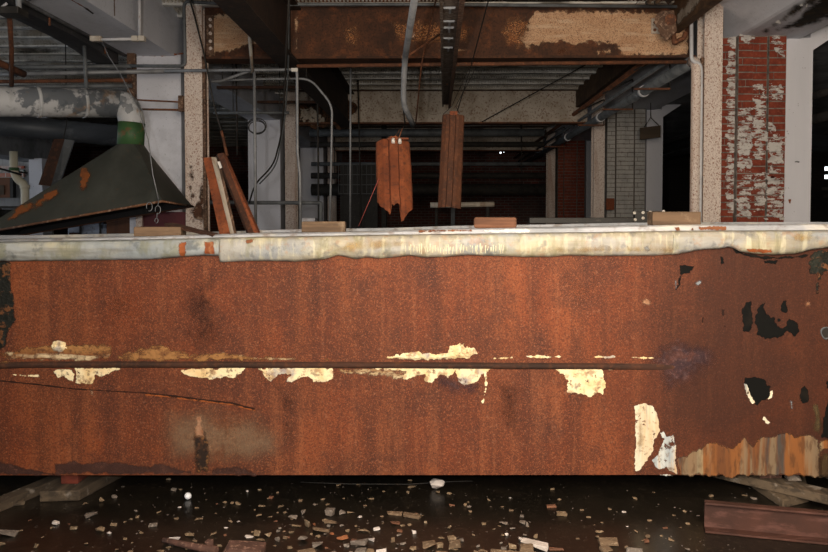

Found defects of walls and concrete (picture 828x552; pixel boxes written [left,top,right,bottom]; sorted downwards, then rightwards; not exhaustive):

peeling [520,0,699,55]
peeling [725,34,786,220]
rust [8,139,64,220]
rust [80,168,90,190]
rust [204,242,215,254]
crack [0,380,255,409]
peeling [1,340,490,403]
peeling [556,369,606,397]
rust [194,416,209,472]
leakage [175,422,268,453]
peeling [634,403,677,476]